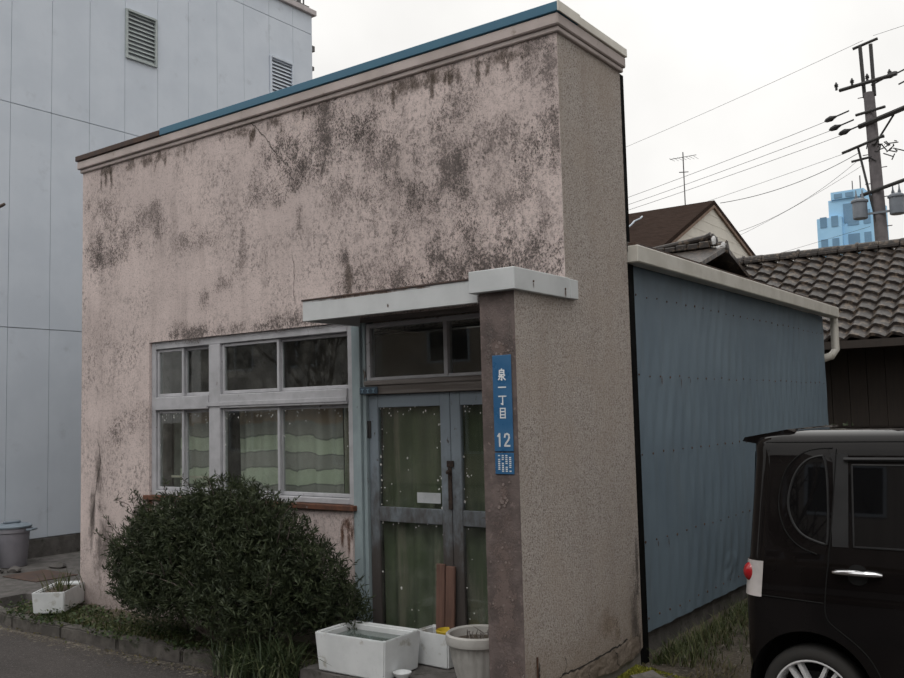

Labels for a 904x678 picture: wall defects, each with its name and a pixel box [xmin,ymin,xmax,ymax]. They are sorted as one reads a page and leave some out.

leakage [223,36,562,293]
leakage [85,200,164,271]
leakage [169,311,323,342]
leakage [90,494,109,566]